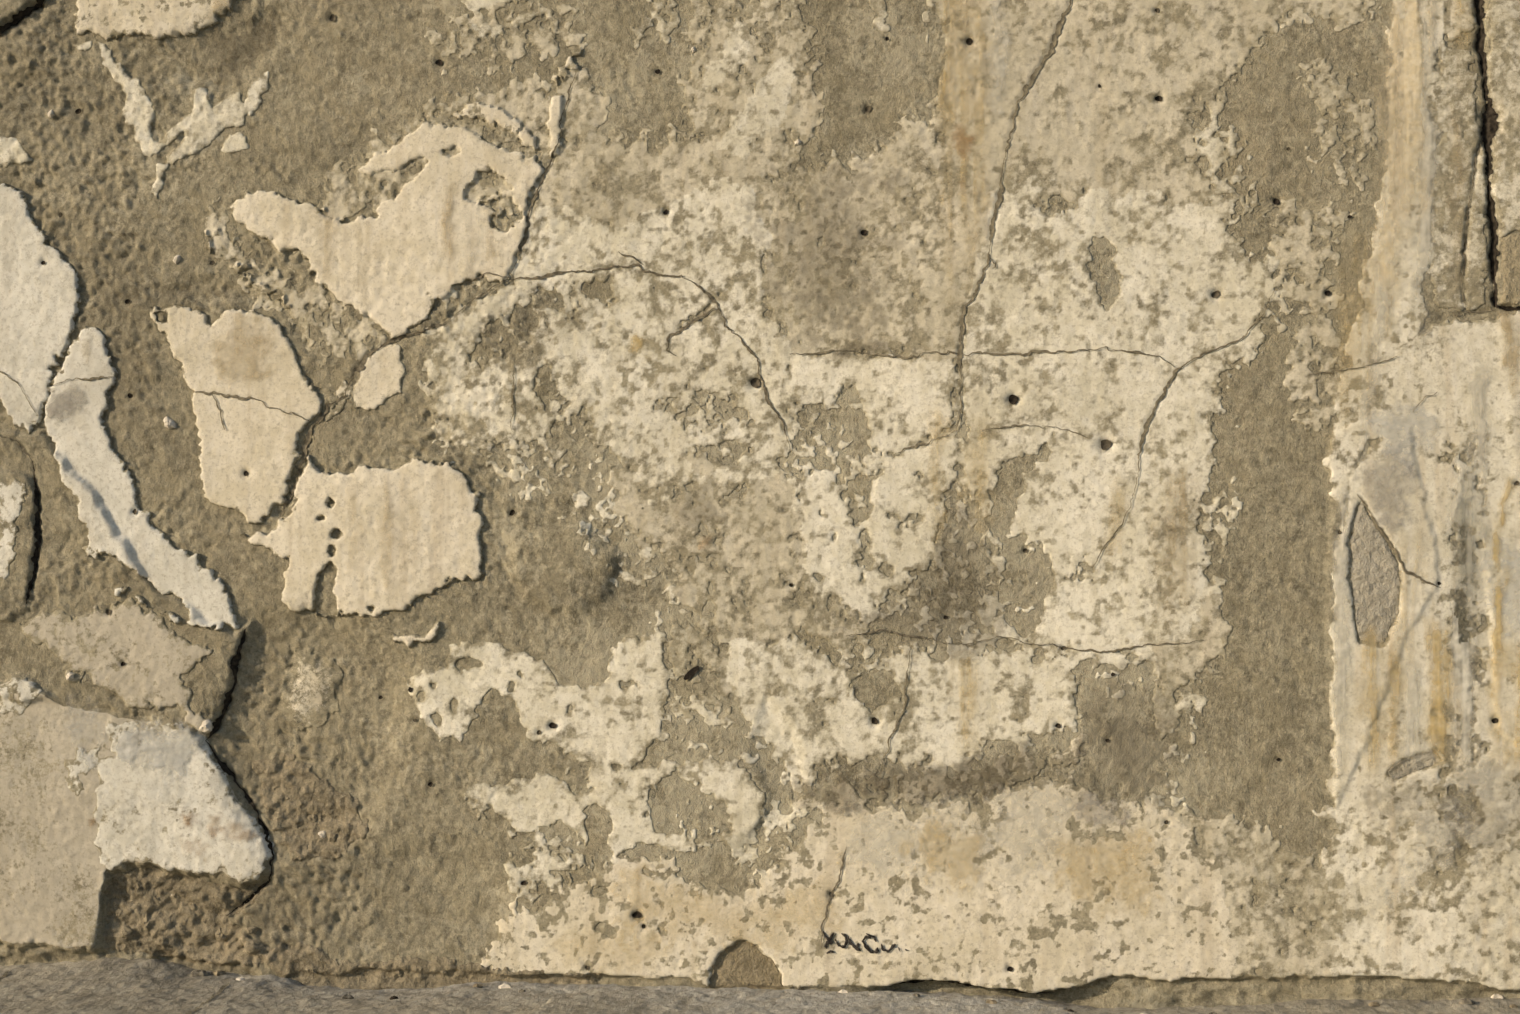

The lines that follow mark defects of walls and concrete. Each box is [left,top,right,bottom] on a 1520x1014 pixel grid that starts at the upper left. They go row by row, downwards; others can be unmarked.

peeling [0,135,32,168]
peeling [0,183,239,631]
peeling [73,0,270,199]
peeling [104,0,1339,993]
crack [195,0,1275,568]
crack [1308,356,1397,376]
peeling [1261,0,1520,817]
crack [1454,0,1520,316]
peeling [0,677,43,716]
peeling [18,594,275,884]
crack [205,629,274,916]
peeling [1312,774,1520,990]